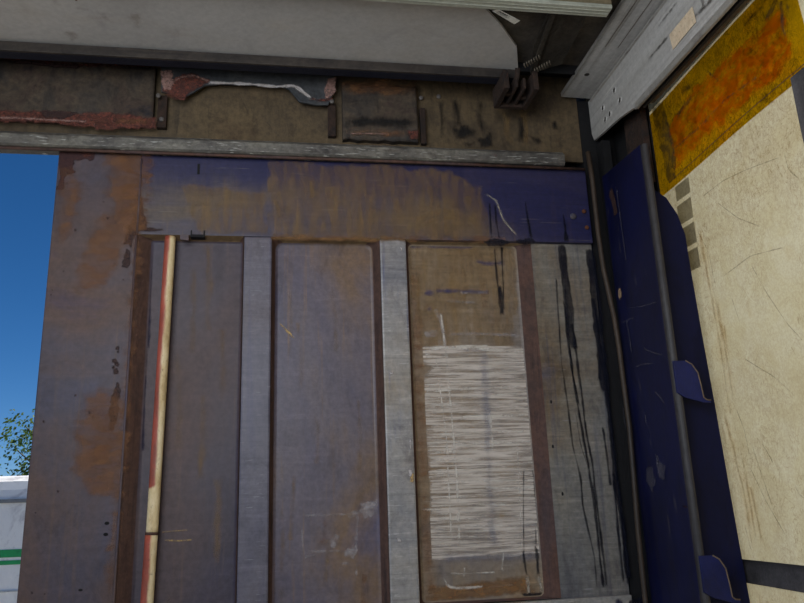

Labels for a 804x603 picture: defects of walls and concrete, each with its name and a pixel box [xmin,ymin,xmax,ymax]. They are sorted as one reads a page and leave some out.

corrosion [161,70,336,101]
corrosion [0,110,157,130]
corrosion [109,346,121,431]